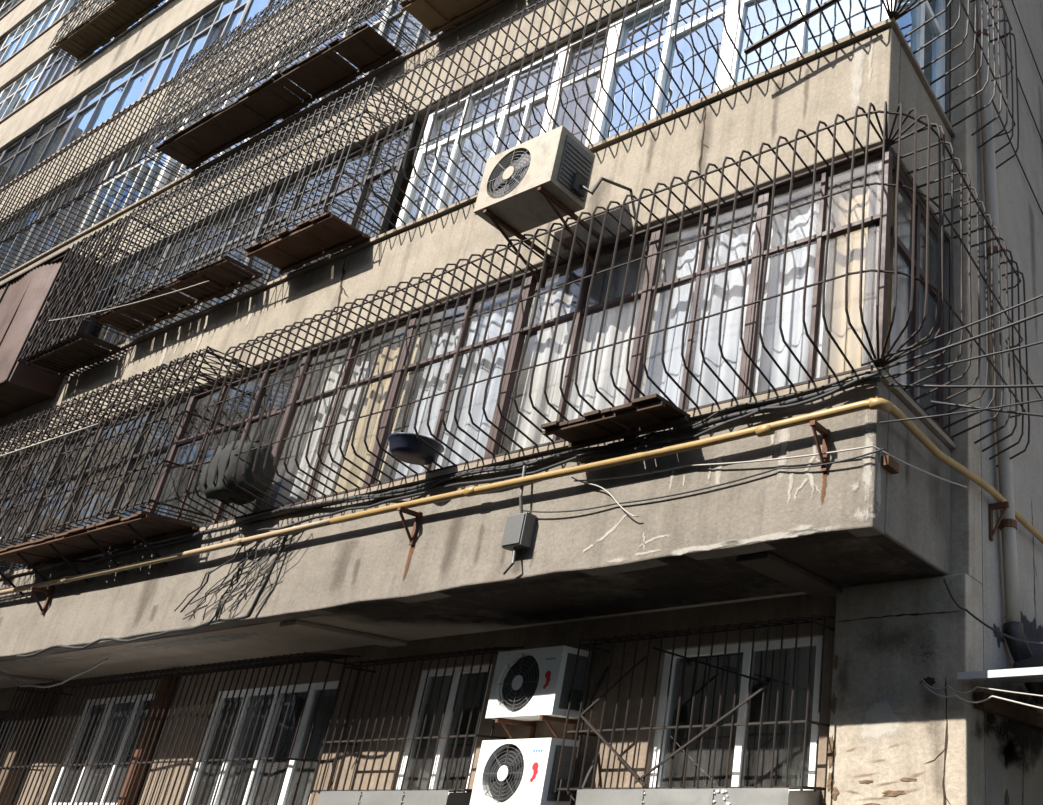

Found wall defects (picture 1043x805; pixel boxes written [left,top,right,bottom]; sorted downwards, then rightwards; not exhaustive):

damp [851,44,873,106]
spalling [827,735,840,801]
spalling [863,777,917,805]
crack [924,679,951,805]